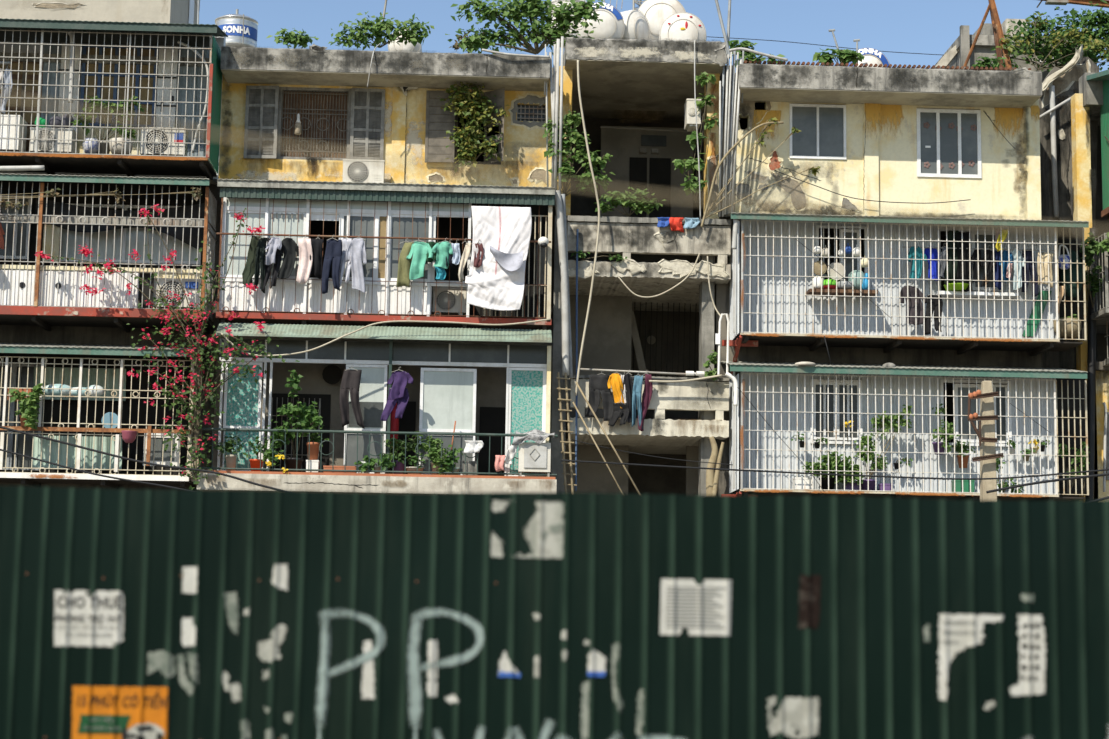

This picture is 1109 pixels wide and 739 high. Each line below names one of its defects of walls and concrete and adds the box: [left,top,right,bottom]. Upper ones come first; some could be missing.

water stain [232,48,319,66]
water stain [340,49,373,66]
water stain [389,52,431,71]
water stain [447,55,485,70]
water stain [503,56,540,73]
water stain [753,65,807,85]
water stain [843,69,864,87]
water stain [890,71,927,83]
water stain [948,73,980,88]
water stain [1015,106,1028,206]
water stain [571,224,678,250]